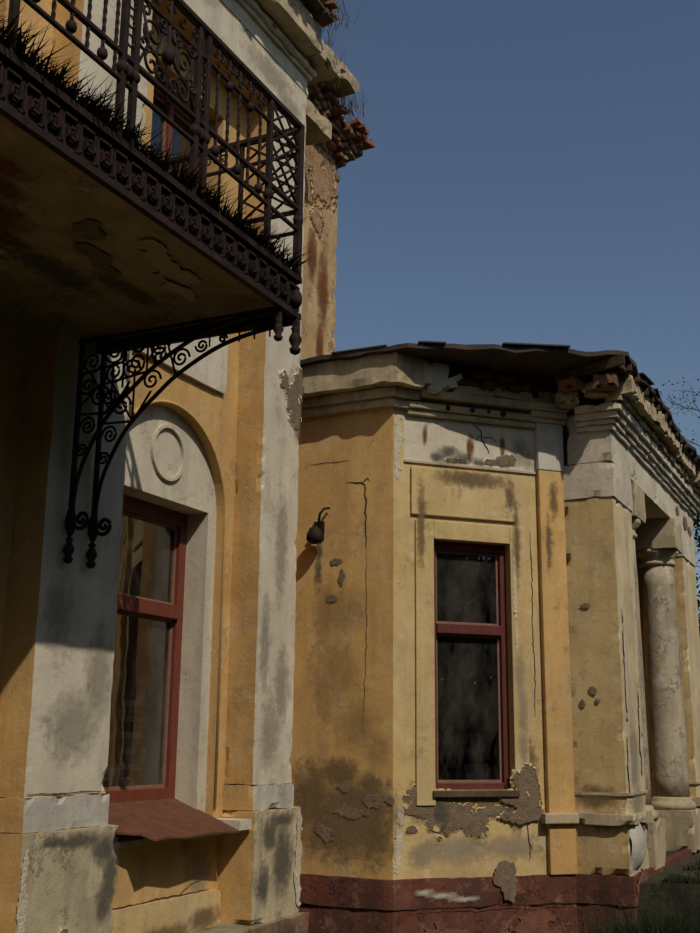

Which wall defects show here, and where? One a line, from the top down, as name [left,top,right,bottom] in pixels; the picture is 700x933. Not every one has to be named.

flaking render [304,144,340,239]
peeling [278,364,305,431]
flaking render [482,453,518,468]
flaking render [326,558,346,603]
crack [312,460,369,730]
leakage [260,760,394,901]
flaking render [333,763,545,874]
crack [112,880,208,909]
peeling [493,860,518,903]